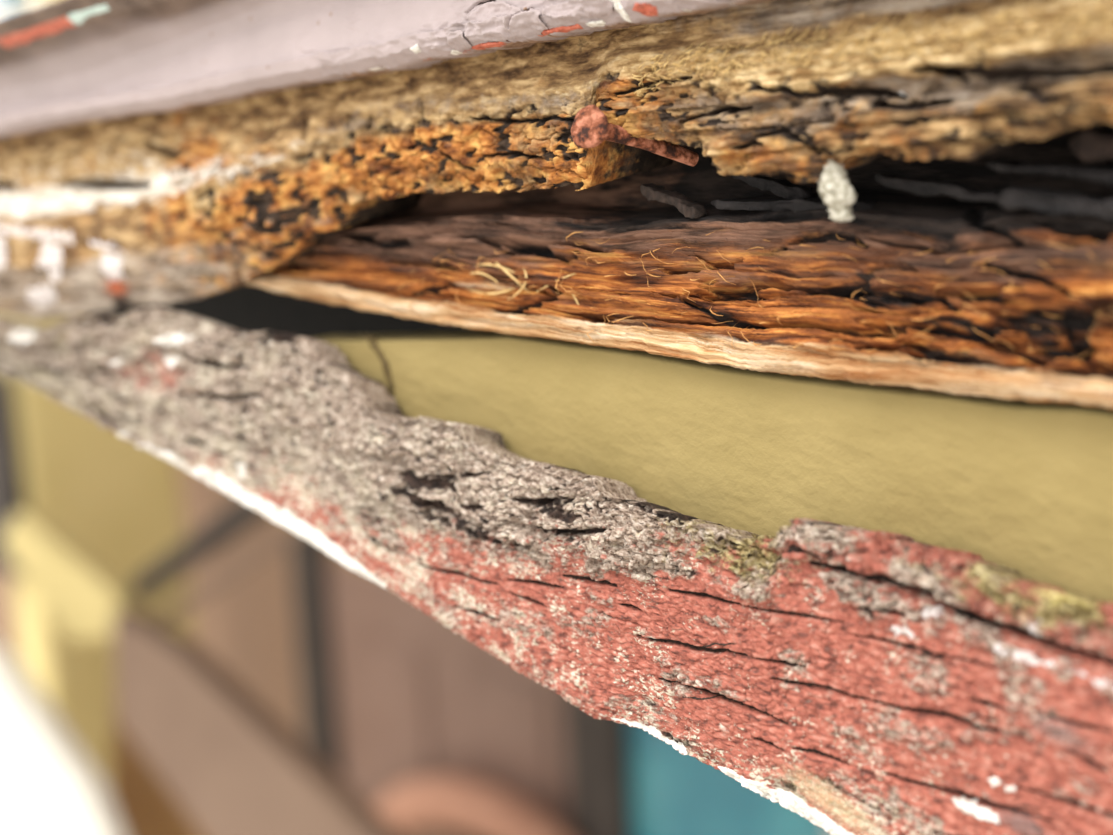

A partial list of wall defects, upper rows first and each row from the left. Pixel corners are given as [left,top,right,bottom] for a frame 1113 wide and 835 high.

peeling [7,328,44,347]
peeling [153,331,195,368]
peeling [115,429,388,589]
crack [538,526,605,534]
crack [814,562,932,591]
crack [671,589,842,622]
crack [649,638,746,654]
crack [999,621,1113,664]
crack [682,688,841,760]
crack [772,678,1027,738]
crack [905,778,1113,821]